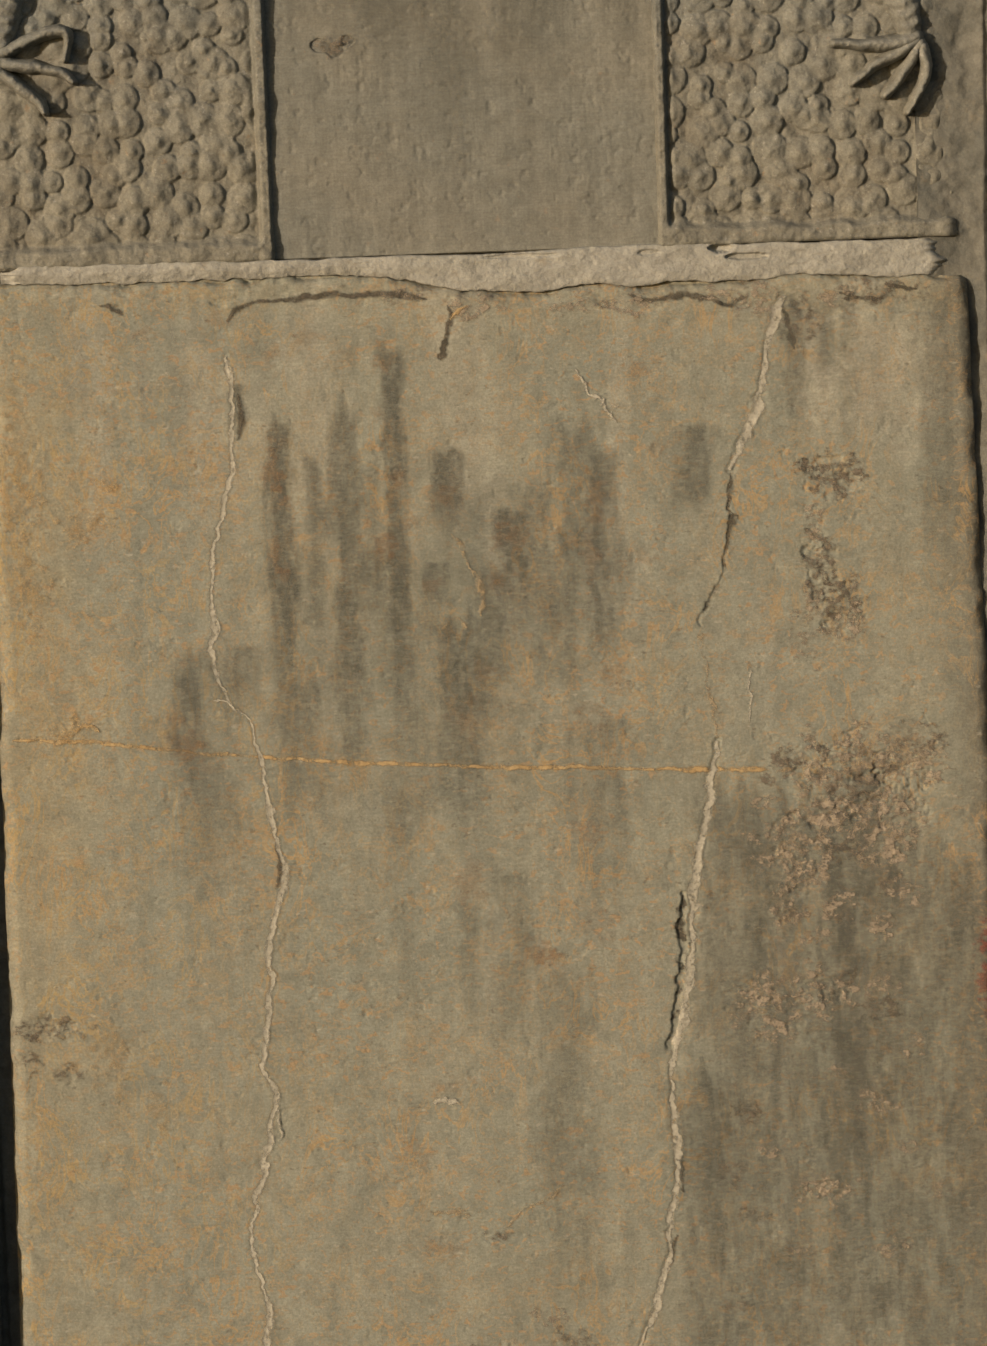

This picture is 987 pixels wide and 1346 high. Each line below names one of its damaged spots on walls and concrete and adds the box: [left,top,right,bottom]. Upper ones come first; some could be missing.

crack [100,304,122,315]
water stain [268,424,298,641]
crack [227,291,465,360]
water stain [381,357,408,625]
crack [628,291,796,567]
spalling [791,452,869,658]
crack [839,282,916,301]
crack [13,356,923,1346]
spalling [742,716,949,944]
spalling [718,961,903,1044]